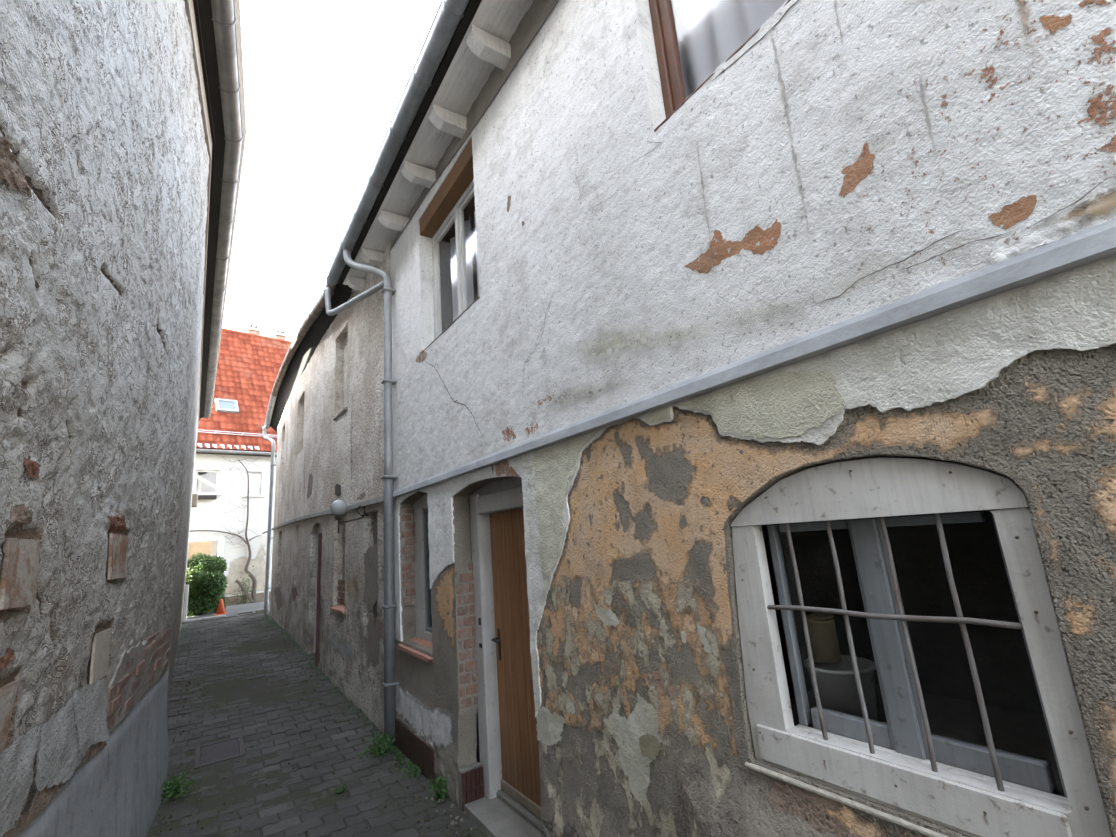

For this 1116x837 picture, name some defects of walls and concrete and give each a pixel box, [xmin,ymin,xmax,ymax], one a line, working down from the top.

peeling [839,0,1116,269]
damp [1068,191,1116,219]
peeling [685,219,782,274]
crack [397,361,482,435]
peeling [502,422,538,441]
spalling [0,605,31,622]
spalling [0,504,46,580]
spalling [105,515,130,585]
flaking render [400,508,416,606]
spalling [536,344,1116,837]
spalling [395,561,478,808]
flaking render [0,617,171,837]